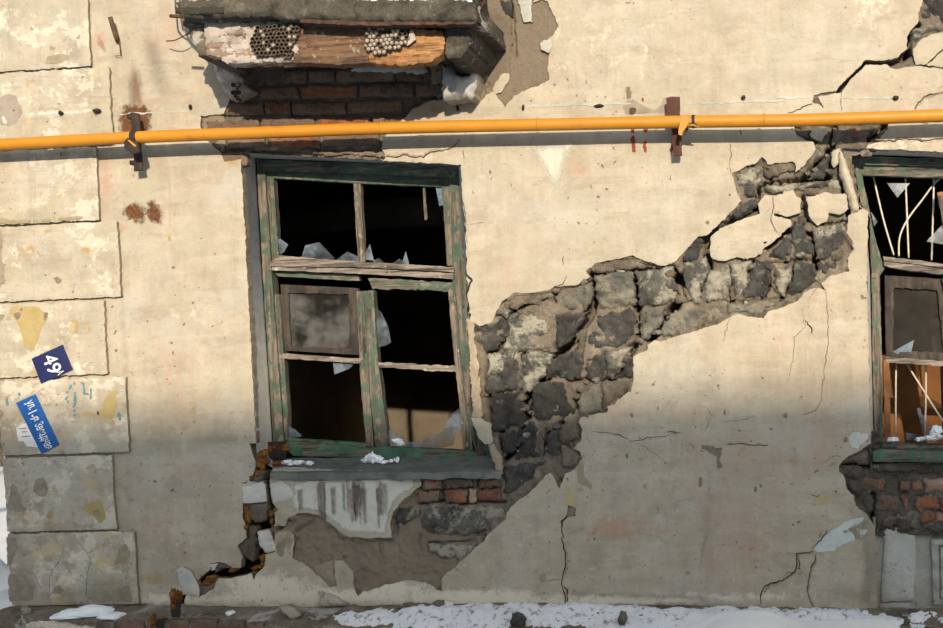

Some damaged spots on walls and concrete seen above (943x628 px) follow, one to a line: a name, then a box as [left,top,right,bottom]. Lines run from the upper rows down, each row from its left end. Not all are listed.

rust [119,85,151,132]
spalling [202,57,451,129]
spalling [480,0,558,107]
rust [631,129,648,152]
rust [623,88,673,115]
spalling [812,0,943,108]
crack [875,86,943,142]
rust [125,201,162,223]
spalling [271,124,888,595]
spalling [814,431,943,552]
crack [150,441,294,628]
crack [760,530,828,608]